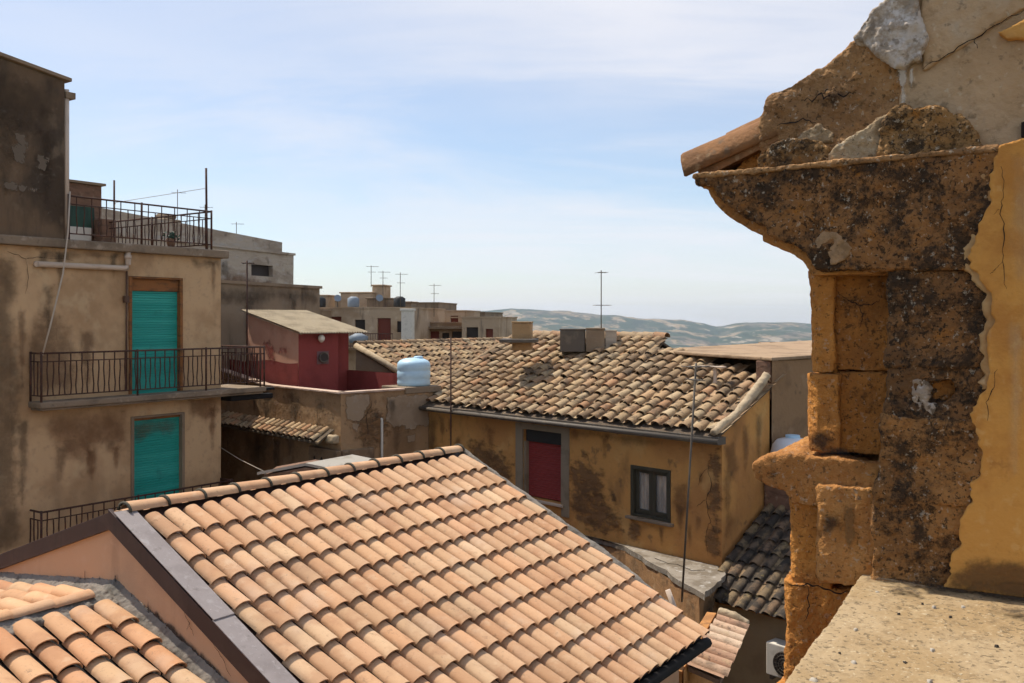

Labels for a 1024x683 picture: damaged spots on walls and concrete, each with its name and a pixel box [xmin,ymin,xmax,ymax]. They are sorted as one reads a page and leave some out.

crack [923,12,1022,69]
crack [777,89,853,126]
crack [991,167,1006,287]
spalling [912,379,955,414]